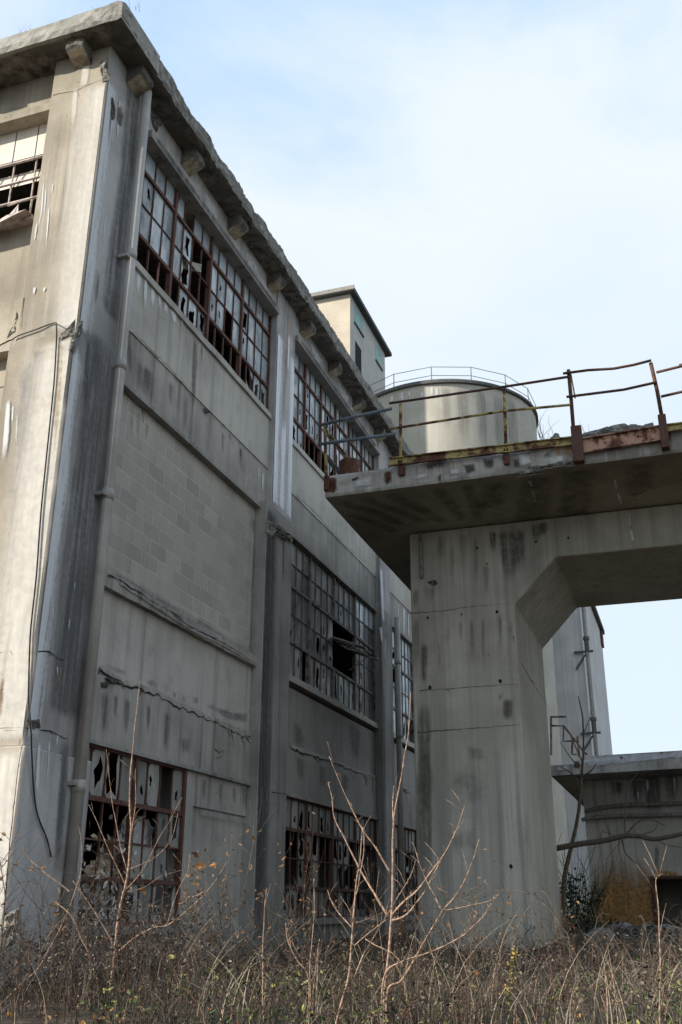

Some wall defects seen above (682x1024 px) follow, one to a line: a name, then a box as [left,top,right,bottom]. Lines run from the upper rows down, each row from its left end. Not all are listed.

damp [0,65,136,853]
crack [109,575,257,666]
crack [100,666,251,744]
crack [291,745,377,784]